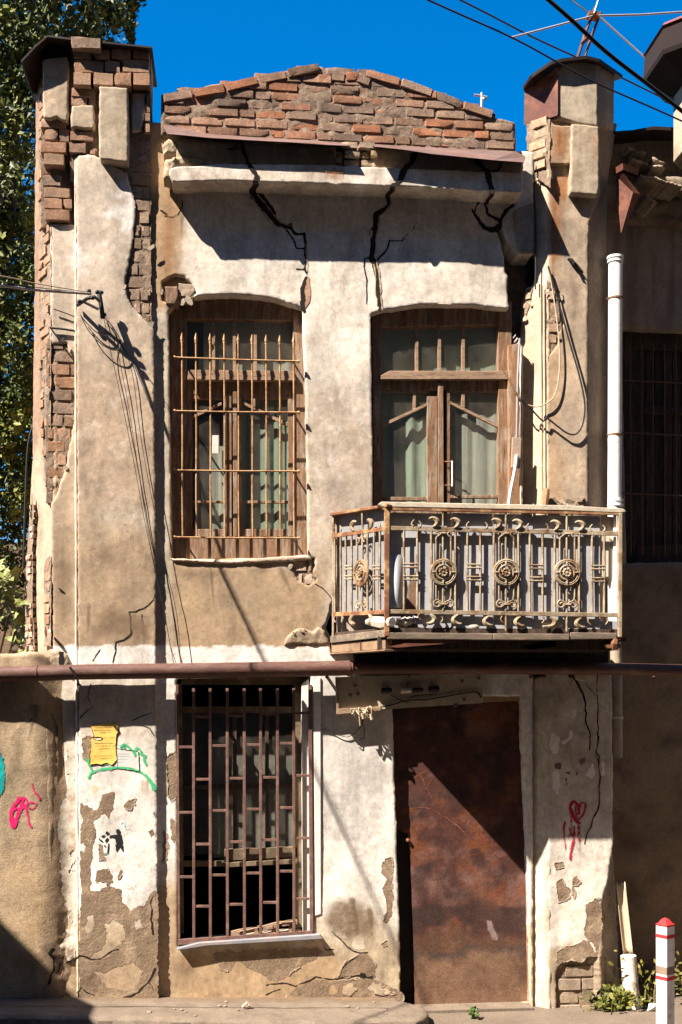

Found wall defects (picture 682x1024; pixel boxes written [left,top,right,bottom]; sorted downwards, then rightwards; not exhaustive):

flaking render [123,153,196,328]
crack [227,140,308,275]
crack [363,152,418,312]
crack [471,159,515,233]
flaking render [24,87,75,665]
flaking render [288,558,316,585]
crack [80,598,155,718]
crack [568,675,601,844]
peeling [57,735,159,998]
crack [266,931,389,997]
peeling [381,856,394,923]
flaking render [554,861,607,1008]